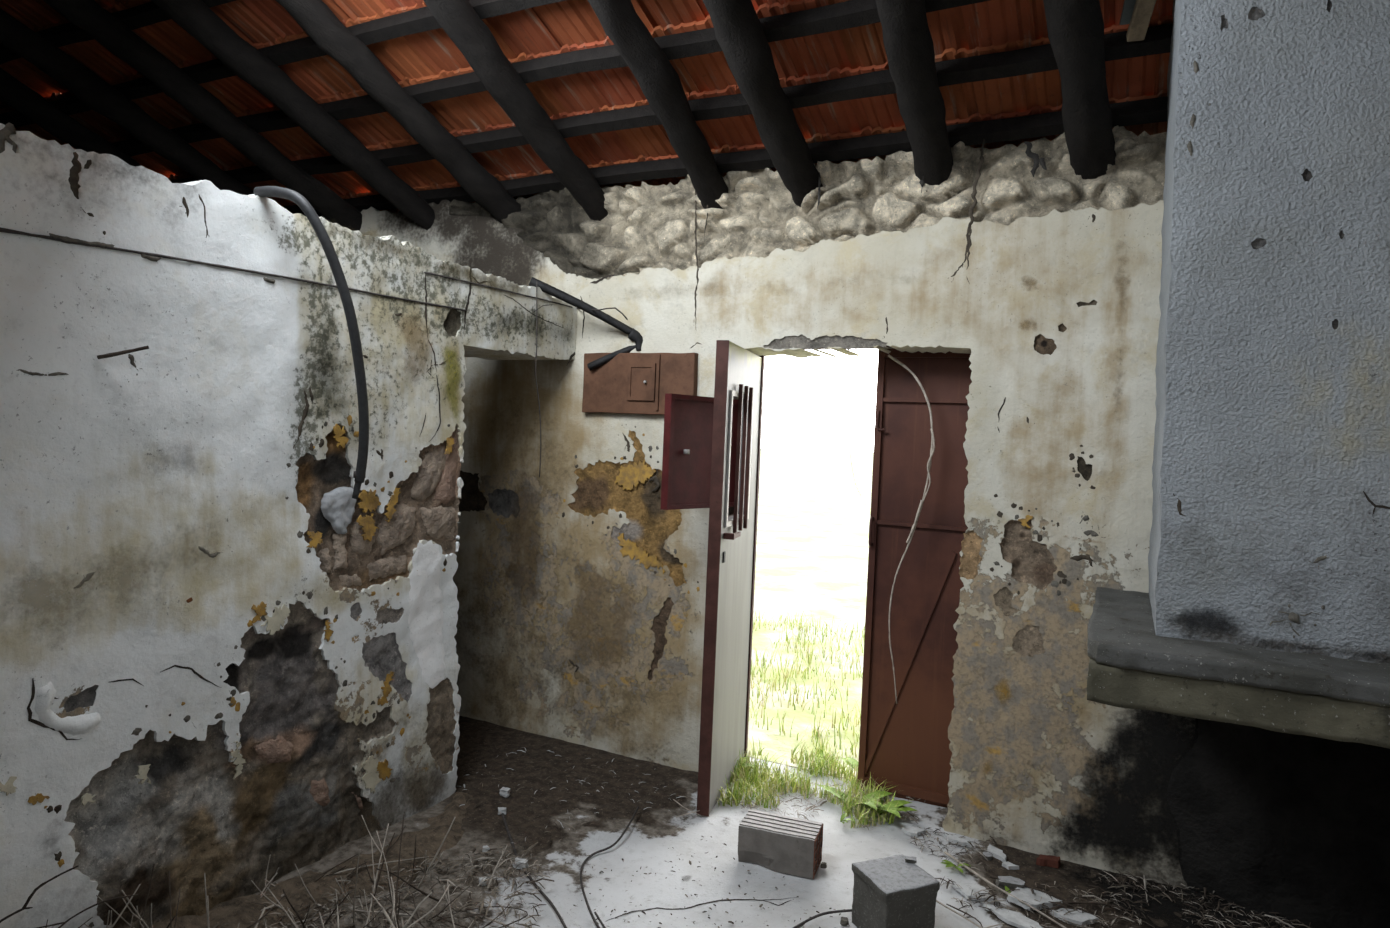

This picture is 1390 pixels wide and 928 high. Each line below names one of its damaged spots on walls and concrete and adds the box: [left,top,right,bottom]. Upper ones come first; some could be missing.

flaking render [449,125,1167,280]
water stain [293,387,316,449]
spalling [562,426,700,681]
spalling [959,494,1079,657]
spalling [0,415,520,928]